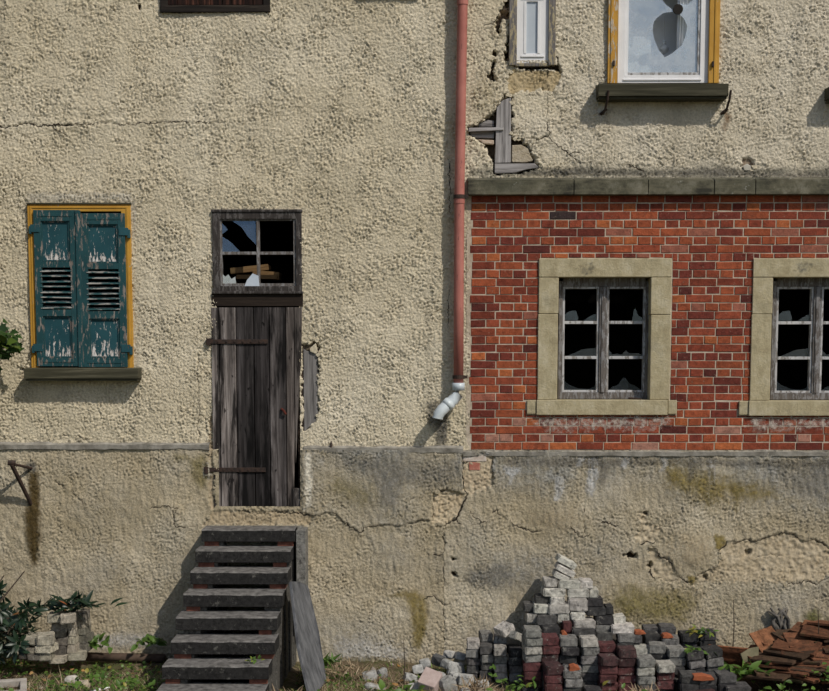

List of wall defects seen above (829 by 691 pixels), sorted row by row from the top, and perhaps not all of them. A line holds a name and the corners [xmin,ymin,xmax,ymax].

peeling [498,0,509,21]
crack [0,120,213,137]
spalling [468,43,561,176]
spalling [301,338,320,431]
crack [244,510,383,533]
peeling [431,455,494,525]
crack [412,460,539,648]